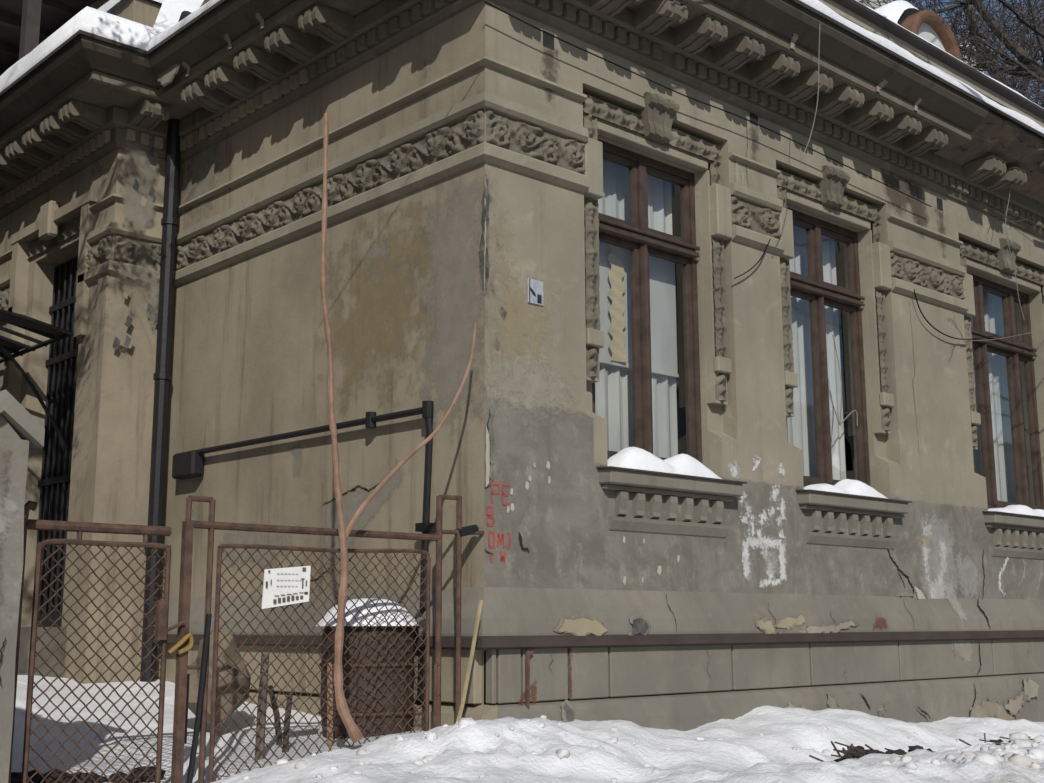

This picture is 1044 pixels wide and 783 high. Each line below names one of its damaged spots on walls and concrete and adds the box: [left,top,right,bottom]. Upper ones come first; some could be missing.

water stain [331,175,496,432]
crack [327,485,376,504]
crack [887,548,927,620]
crack [954,549,991,717]